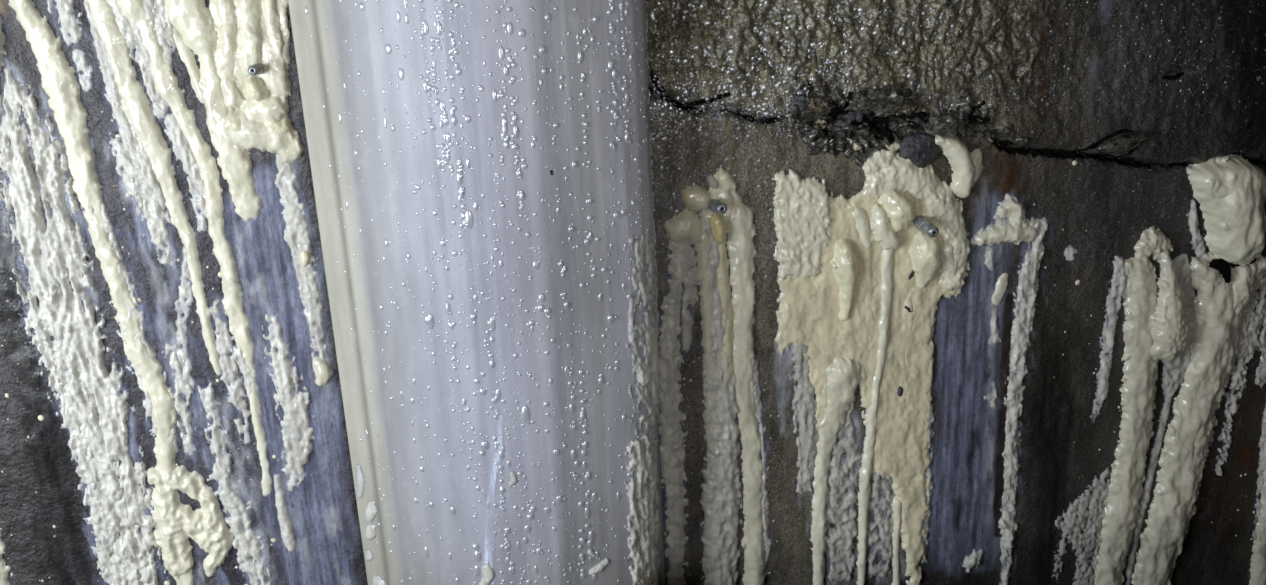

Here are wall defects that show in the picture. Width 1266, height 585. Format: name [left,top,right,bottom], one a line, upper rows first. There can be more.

crack [649,68,854,125]
crack [1162,72,1185,80]
crack [974,100,1194,169]
crack [1230,151,1266,167]